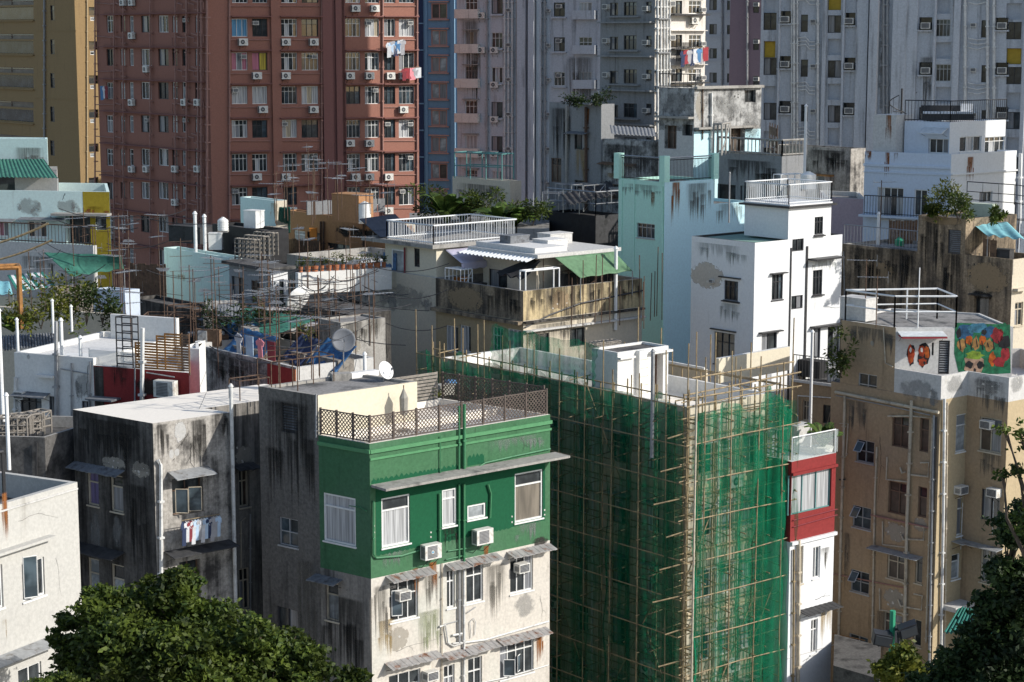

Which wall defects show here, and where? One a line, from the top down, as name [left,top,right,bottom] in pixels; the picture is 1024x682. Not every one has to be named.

rust [671,182,680,221]
water stain [855,249,910,288]
water stain [531,280,639,306]
water stain [269,402,313,482]
water stain [374,587,392,649]